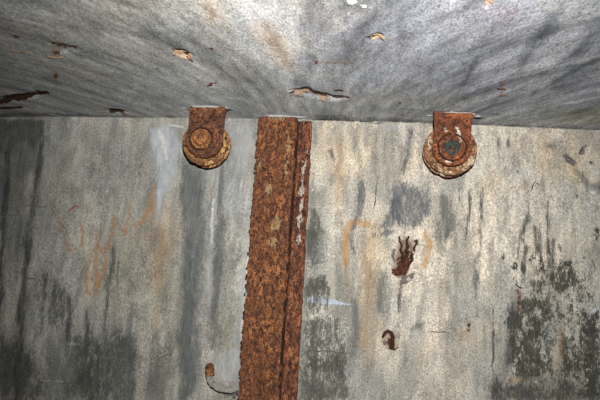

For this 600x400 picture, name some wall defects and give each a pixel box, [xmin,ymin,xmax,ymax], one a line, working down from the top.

spalling [0,90,50,109]
spalling [173,49,194,62]
spalling [289,88,349,101]
water stain [0,113,44,308]
water stain [0,222,46,400]
water stain [299,275,349,400]
water stain [491,206,600,400]